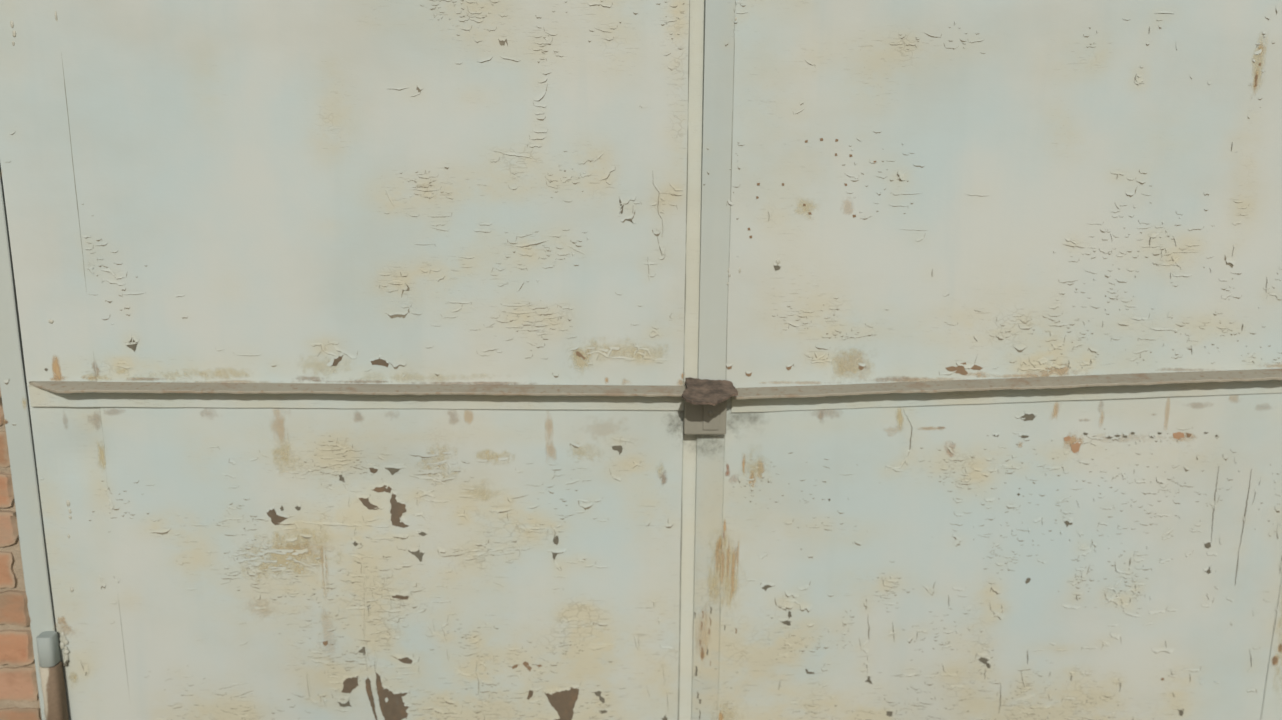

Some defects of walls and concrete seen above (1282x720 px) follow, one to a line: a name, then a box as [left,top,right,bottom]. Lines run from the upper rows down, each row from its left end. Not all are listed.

peeling [420,0,567,190]
peeling [618,193,642,224]
peeling [378,268,472,327]
peeling [469,221,589,378]
peeling [989,169,1282,364]
peeling [310,340,407,378]
peeling [918,410,1240,620]
peeling [746,578,815,627]
peeling [486,641,626,720]